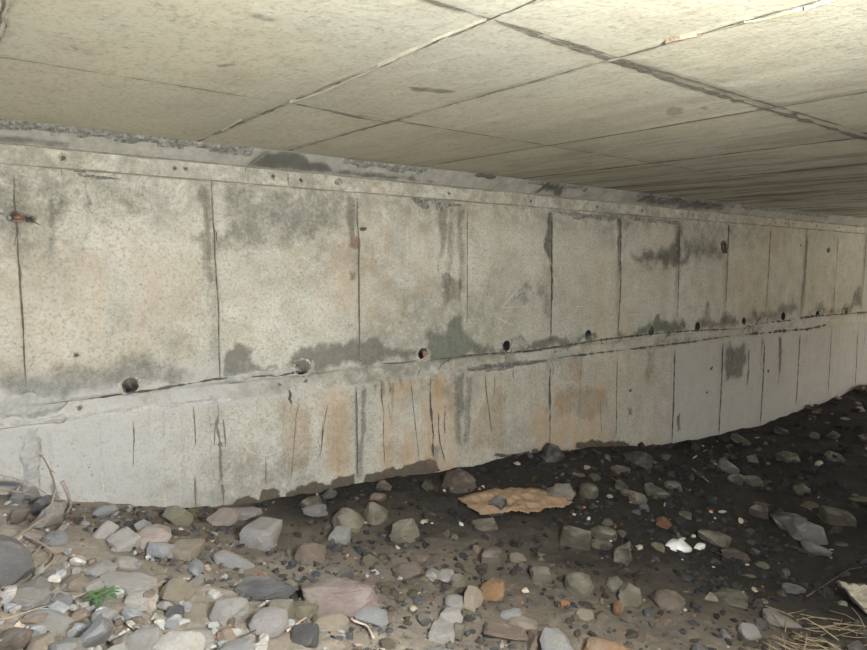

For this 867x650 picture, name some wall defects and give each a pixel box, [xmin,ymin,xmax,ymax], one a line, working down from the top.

damp [251,152,329,171]
damp [644,228,681,266]
damp [225,344,259,375]
damp [291,338,416,373]
damp [427,317,504,360]
damp [519,334,596,352]